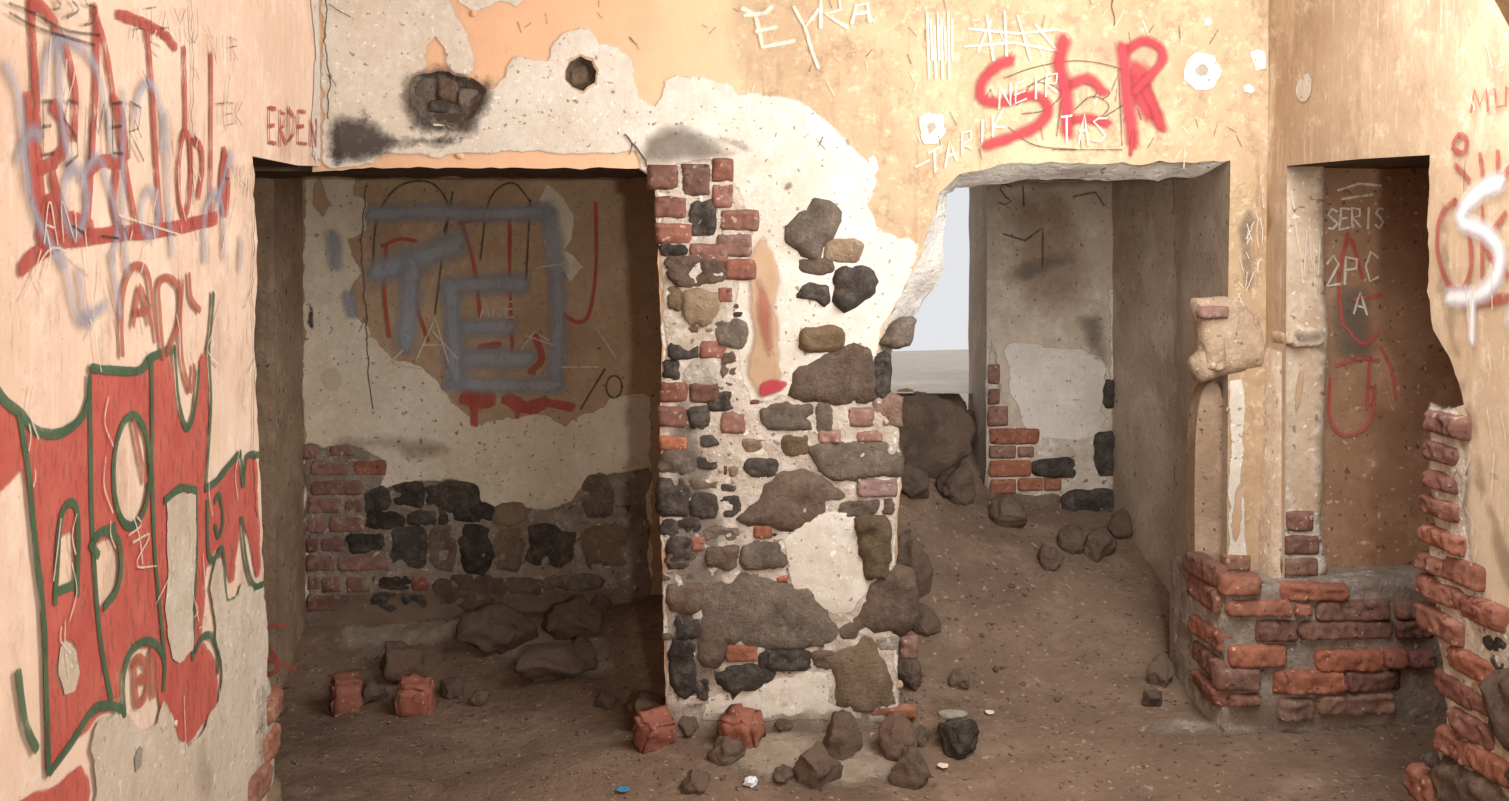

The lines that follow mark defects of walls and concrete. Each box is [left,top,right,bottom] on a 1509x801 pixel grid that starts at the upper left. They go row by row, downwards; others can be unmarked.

peeling [58,641,80,695]
peeling [90,492,284,801]
flaking render [303,0,920,736]
flaking render [984,339,1115,512]
spalling [1280,509,1328,577]
flaking render [1403,404,1509,801]